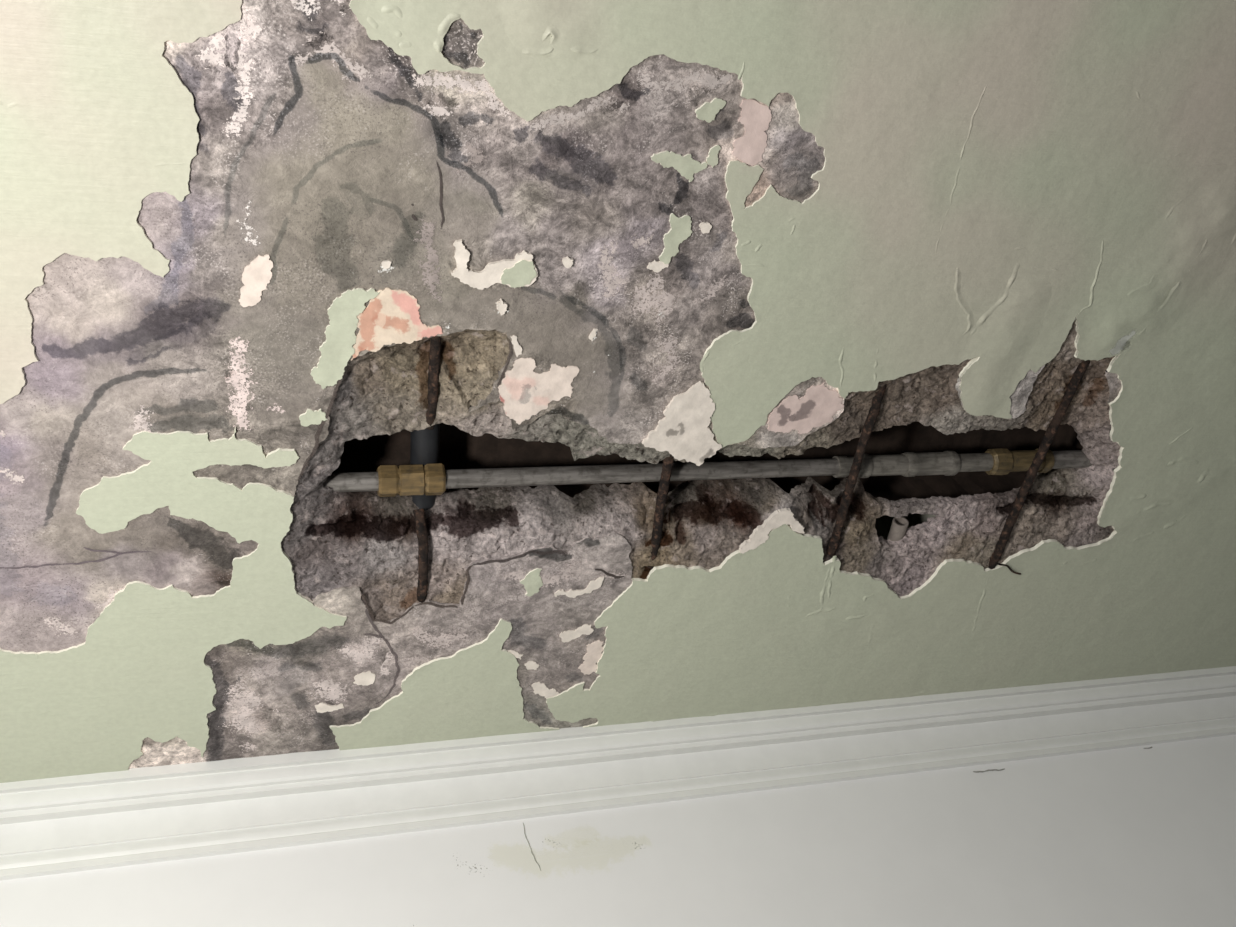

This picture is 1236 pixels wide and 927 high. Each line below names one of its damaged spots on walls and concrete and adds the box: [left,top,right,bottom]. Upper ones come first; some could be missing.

peeling [0,0,1121,769]
rust [645,494,762,547]
rust [808,484,865,527]
rust [996,493,1097,515]